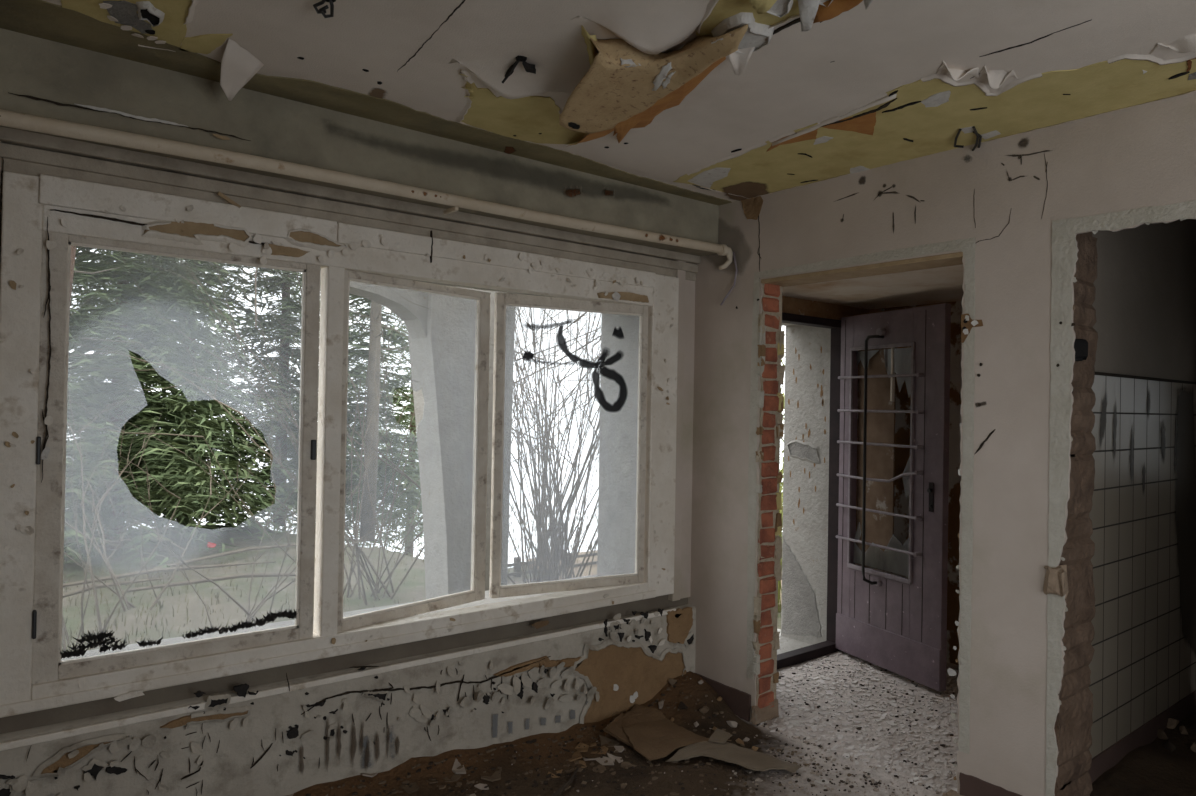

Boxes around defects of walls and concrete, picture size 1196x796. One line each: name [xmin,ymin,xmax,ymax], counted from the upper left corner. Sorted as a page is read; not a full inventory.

peeling [61,0,199,52]
crack [397,0,465,72]
peeling [695,0,873,76]
peeling [455,69,589,145]
peeling [673,52,1196,220]
peeling [141,205,349,265]
flaking render [961,314,983,343]
flaking render [714,284,963,796]
flaking render [1043,230,1115,796]
flaking render [431,594,694,724]
flaking render [0,683,259,796]
peeling [280,724,305,759]